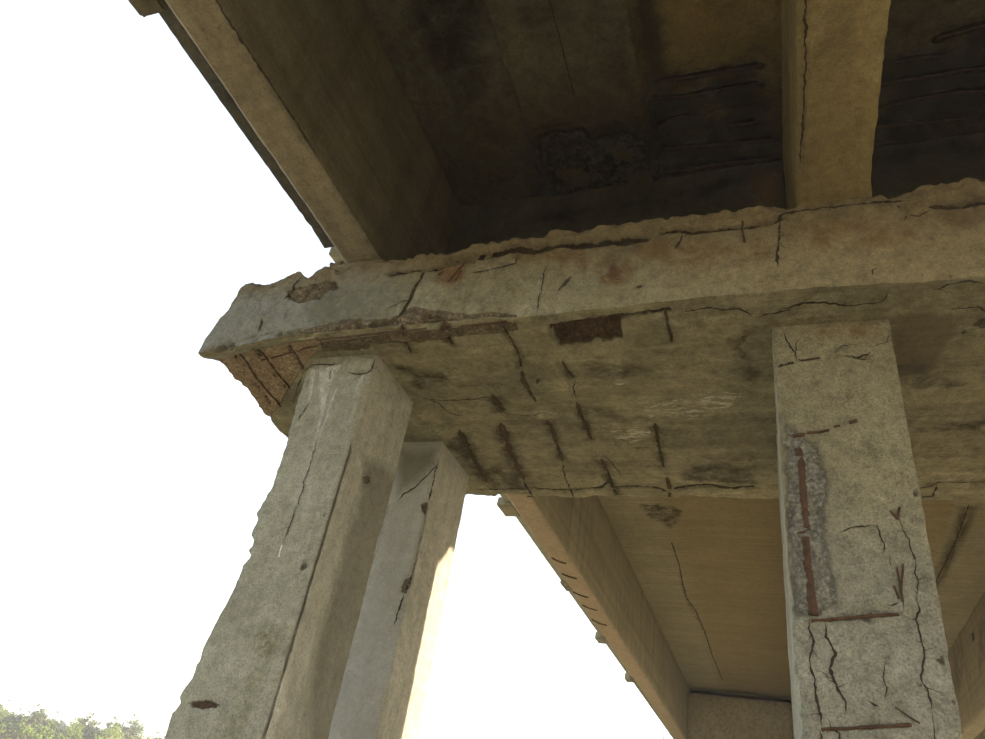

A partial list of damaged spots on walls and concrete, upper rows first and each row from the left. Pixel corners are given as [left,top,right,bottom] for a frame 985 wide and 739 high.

crack [799,0,808,164]
spalling [283,278,339,303]
crack [293,355,378,421]
spalling [215,307,540,419]
spalling [550,307,673,345]
crack [284,442,317,540]
crack [397,464,437,502]
crack [479,479,755,491]
spalling [786,419,904,623]
crack [671,542,723,680]
crack [839,480,985,739]
crack [808,619,879,739]